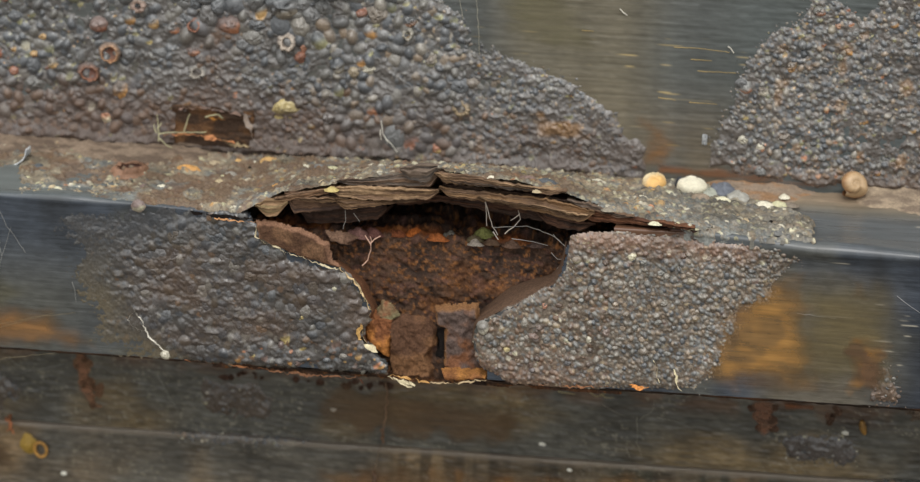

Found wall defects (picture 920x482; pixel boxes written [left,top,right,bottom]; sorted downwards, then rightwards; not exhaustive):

spalling [185,202,616,388]
corrosion [715,289,803,381]
spalling [526,384,622,395]